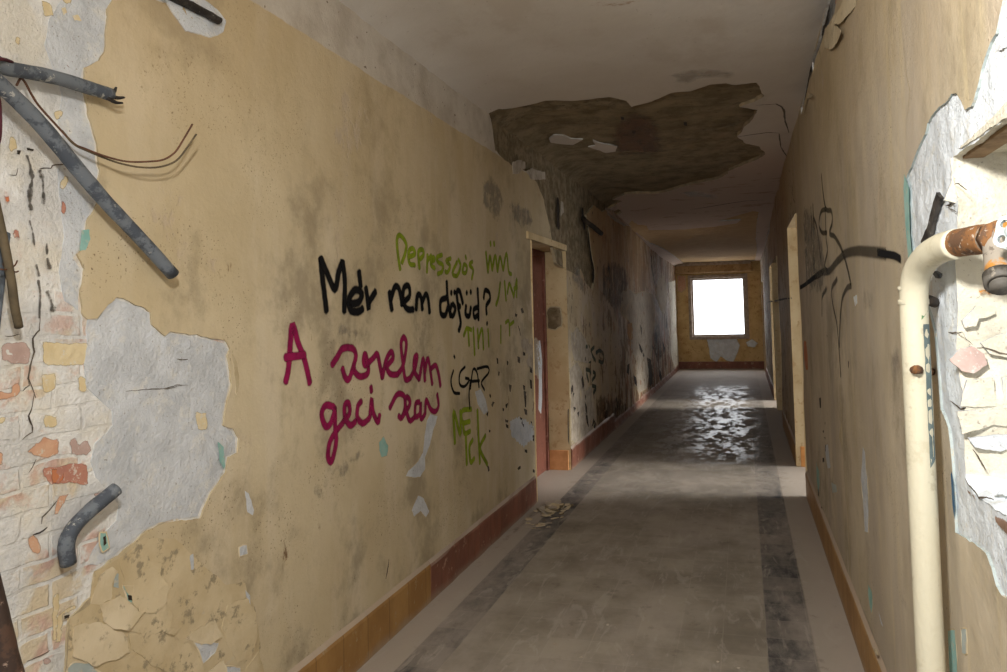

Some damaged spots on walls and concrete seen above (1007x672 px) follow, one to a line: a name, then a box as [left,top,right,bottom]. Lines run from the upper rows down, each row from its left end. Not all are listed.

spalling [0,0,112,79]
spalling [157,0,226,38]
peeling [801,0,857,115]
spalling [1,74,101,181]
spalling [903,0,1007,257]
spalling [0,96,264,672]
spalling [929,260,1007,598]
crack [948,332,1007,355]